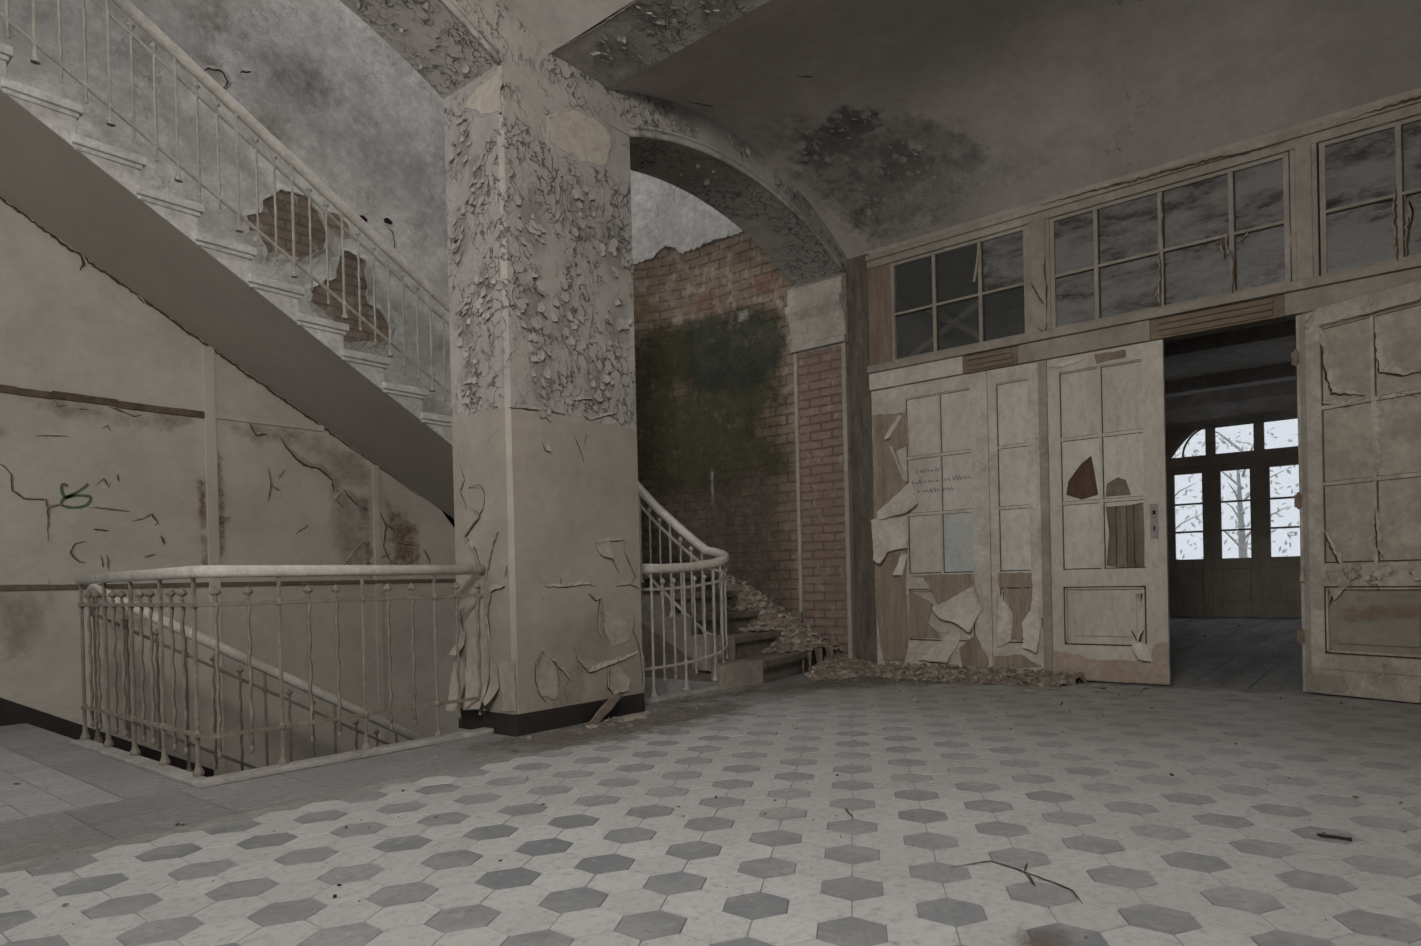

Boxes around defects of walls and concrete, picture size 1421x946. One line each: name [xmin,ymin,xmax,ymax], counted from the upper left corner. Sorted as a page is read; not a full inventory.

peeling [355,0,470,78]
flaking render [448,68,503,263]
water stain [797,112,1008,234]
crack [0,197,420,496]
spalling [242,182,397,351]
peeling [456,264,496,404]
crack [0,464,130,542]
crack [268,468,284,502]
crack [344,513,431,565]
crack [458,465,507,640]
peeling [871,412,1169,683]